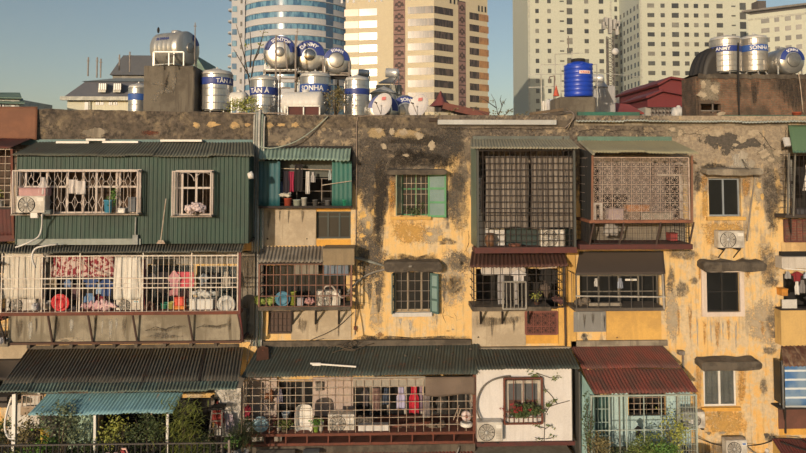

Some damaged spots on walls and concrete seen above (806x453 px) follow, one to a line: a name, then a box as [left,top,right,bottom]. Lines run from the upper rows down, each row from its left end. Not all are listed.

spalling [367,128,436,151]
spalling [698,129,785,170]
damp [763,169,781,230]
damp [355,127,469,312]
damp [668,269,697,296]
damp [671,249,697,259]
damp [761,248,778,287]